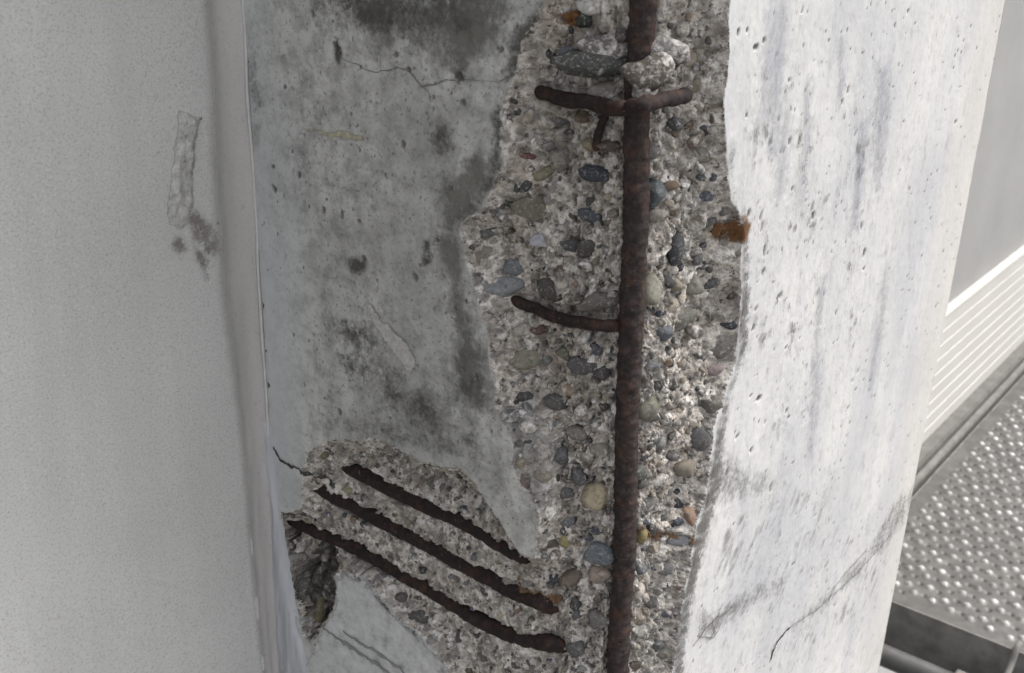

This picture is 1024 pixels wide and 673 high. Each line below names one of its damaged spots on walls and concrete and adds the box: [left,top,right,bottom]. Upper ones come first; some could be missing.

damp [323,0,505,83]
rust [557,10,580,27]
crack [338,53,518,102]
rust [710,216,751,243]
damp [349,258,366,273]
damp [425,110,504,407]
spalling [280,0,742,673]
damp [385,369,439,433]
crack [273,447,335,488]
rust [636,529,701,544]